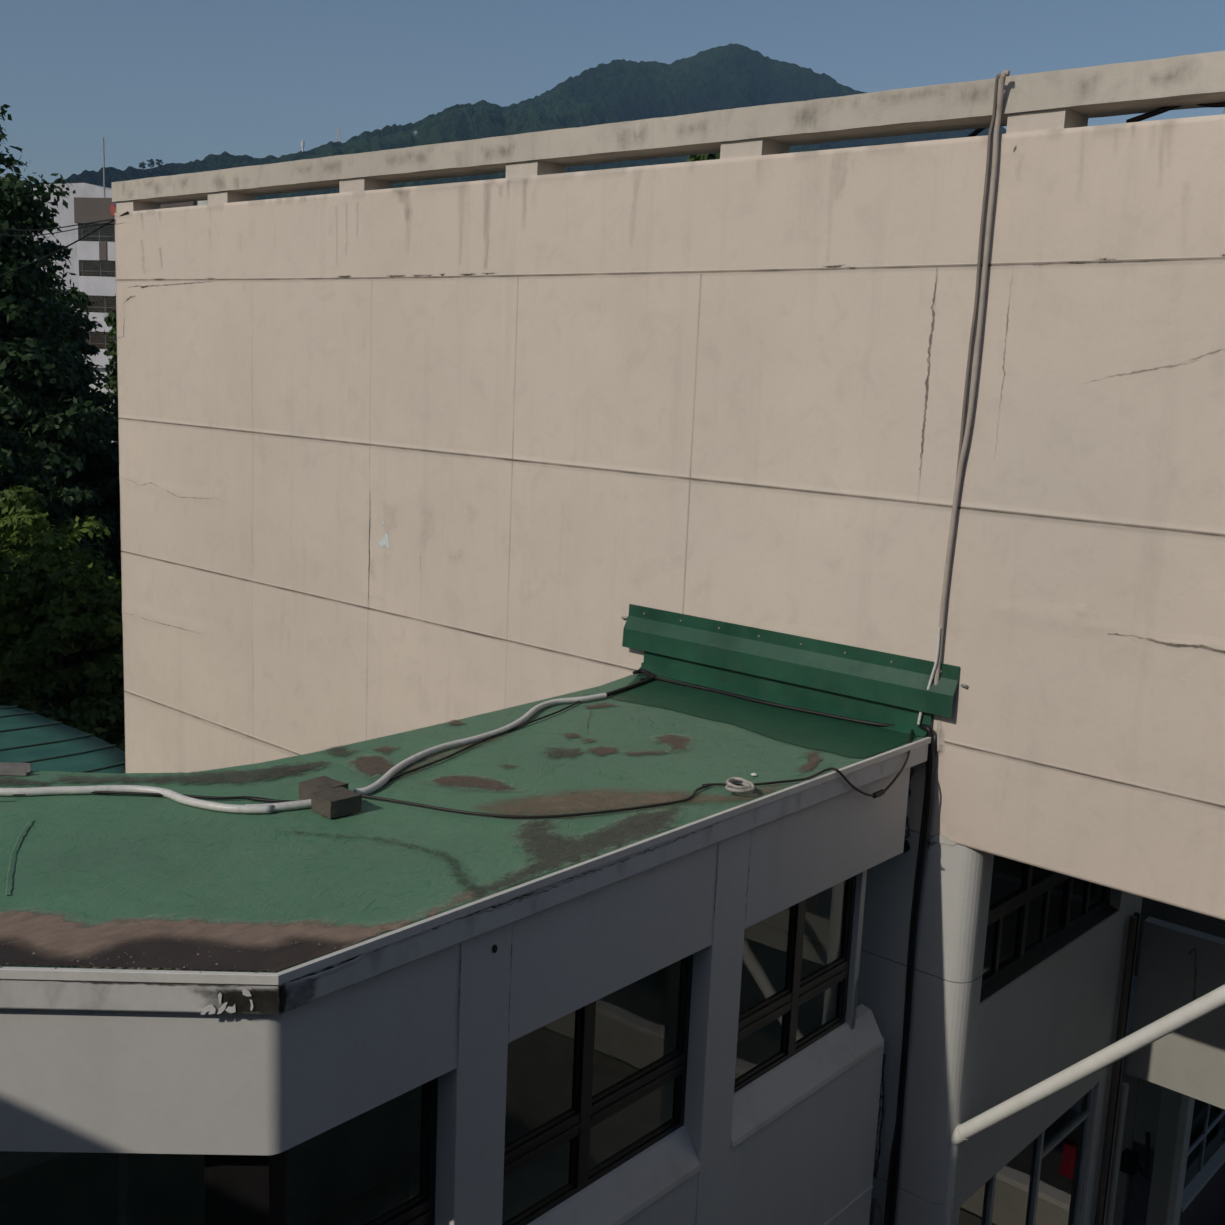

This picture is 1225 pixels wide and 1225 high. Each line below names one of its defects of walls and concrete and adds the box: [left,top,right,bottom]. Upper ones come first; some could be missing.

crack [919,280,937,469]
crack [1115,633,1225,654]
peeling [0,806,682,972]
spalling [196,979,315,1015]